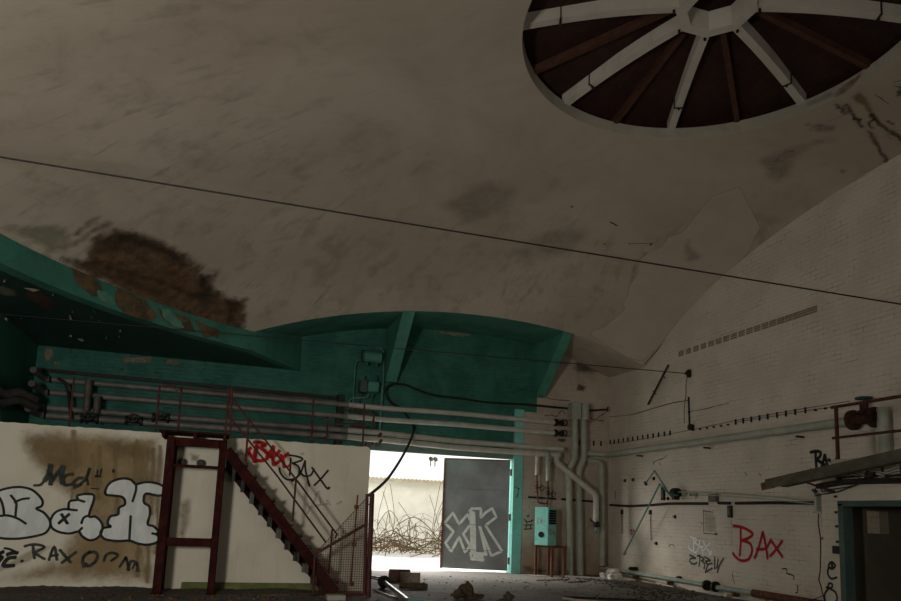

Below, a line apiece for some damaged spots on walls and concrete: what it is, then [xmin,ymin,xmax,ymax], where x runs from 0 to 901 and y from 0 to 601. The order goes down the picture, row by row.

peeling [72,268,220,338]
leakage [26,430,161,528]
leakage [38,533,157,583]